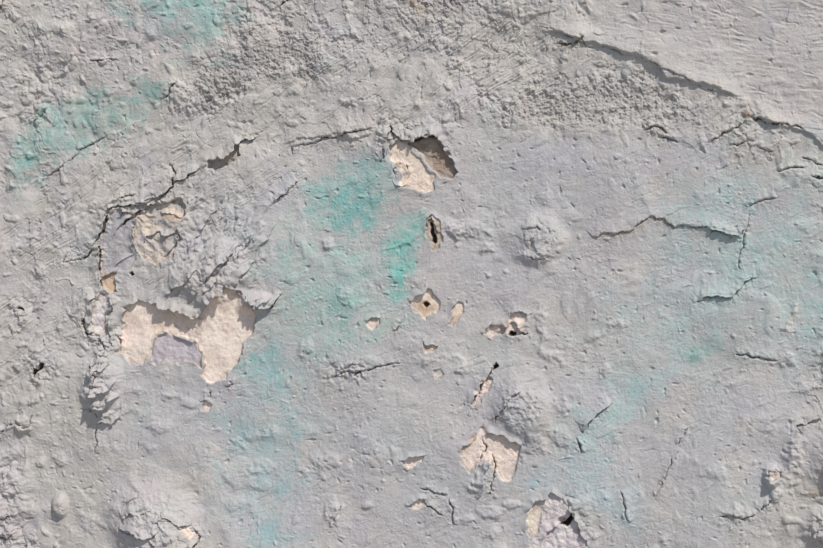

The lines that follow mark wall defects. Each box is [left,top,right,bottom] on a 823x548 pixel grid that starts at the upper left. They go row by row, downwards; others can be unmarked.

crack [551,28,622,55]
crack [48,136,107,176]
crack [291,125,428,172]
spalling [382,122,461,193]
spalling [84,183,257,383]
crack [203,239,250,282]
spalling [407,286,464,327]
spalling [479,305,529,338]
crack [599,198,774,302]
crack [469,368,492,404]
spalling [457,424,522,498]
spalling [524,484,591,548]